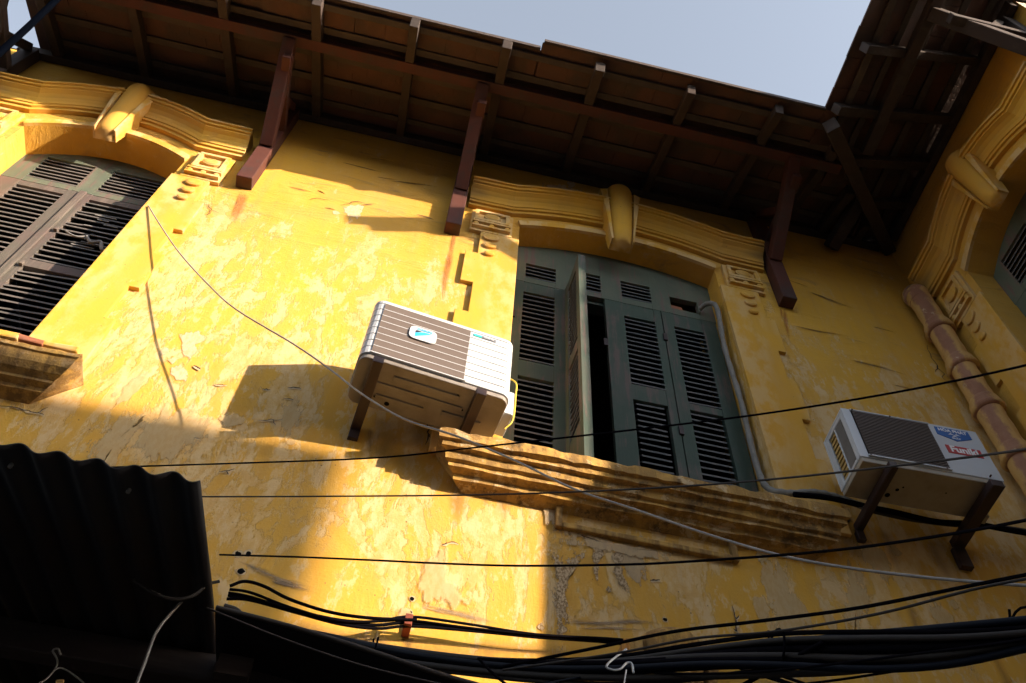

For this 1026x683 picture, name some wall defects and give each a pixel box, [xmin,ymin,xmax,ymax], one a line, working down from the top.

peeling [160,331,206,381]
peeling [88,373,244,466]
flaking render [538,508,673,652]